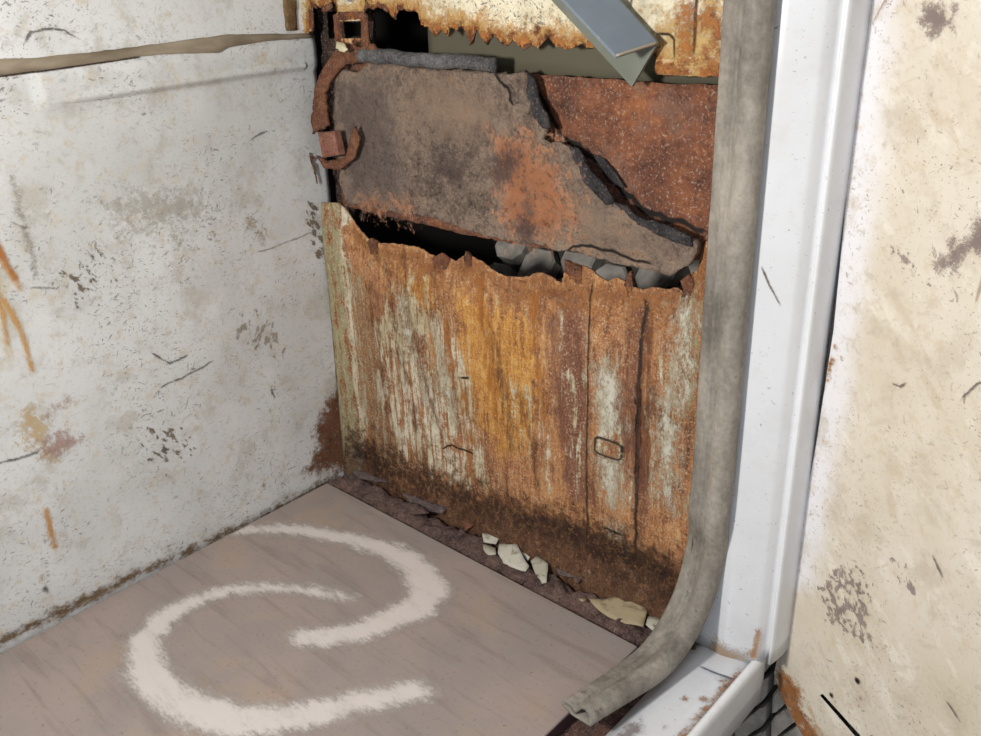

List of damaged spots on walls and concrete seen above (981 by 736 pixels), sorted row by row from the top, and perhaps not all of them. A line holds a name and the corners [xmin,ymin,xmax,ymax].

rust [301,0,593,49]
rust [653,0,723,77]
crack [494,73,705,247]
crack [568,244,651,264]
rust [0,226,707,643]
rust [775,658,822,736]